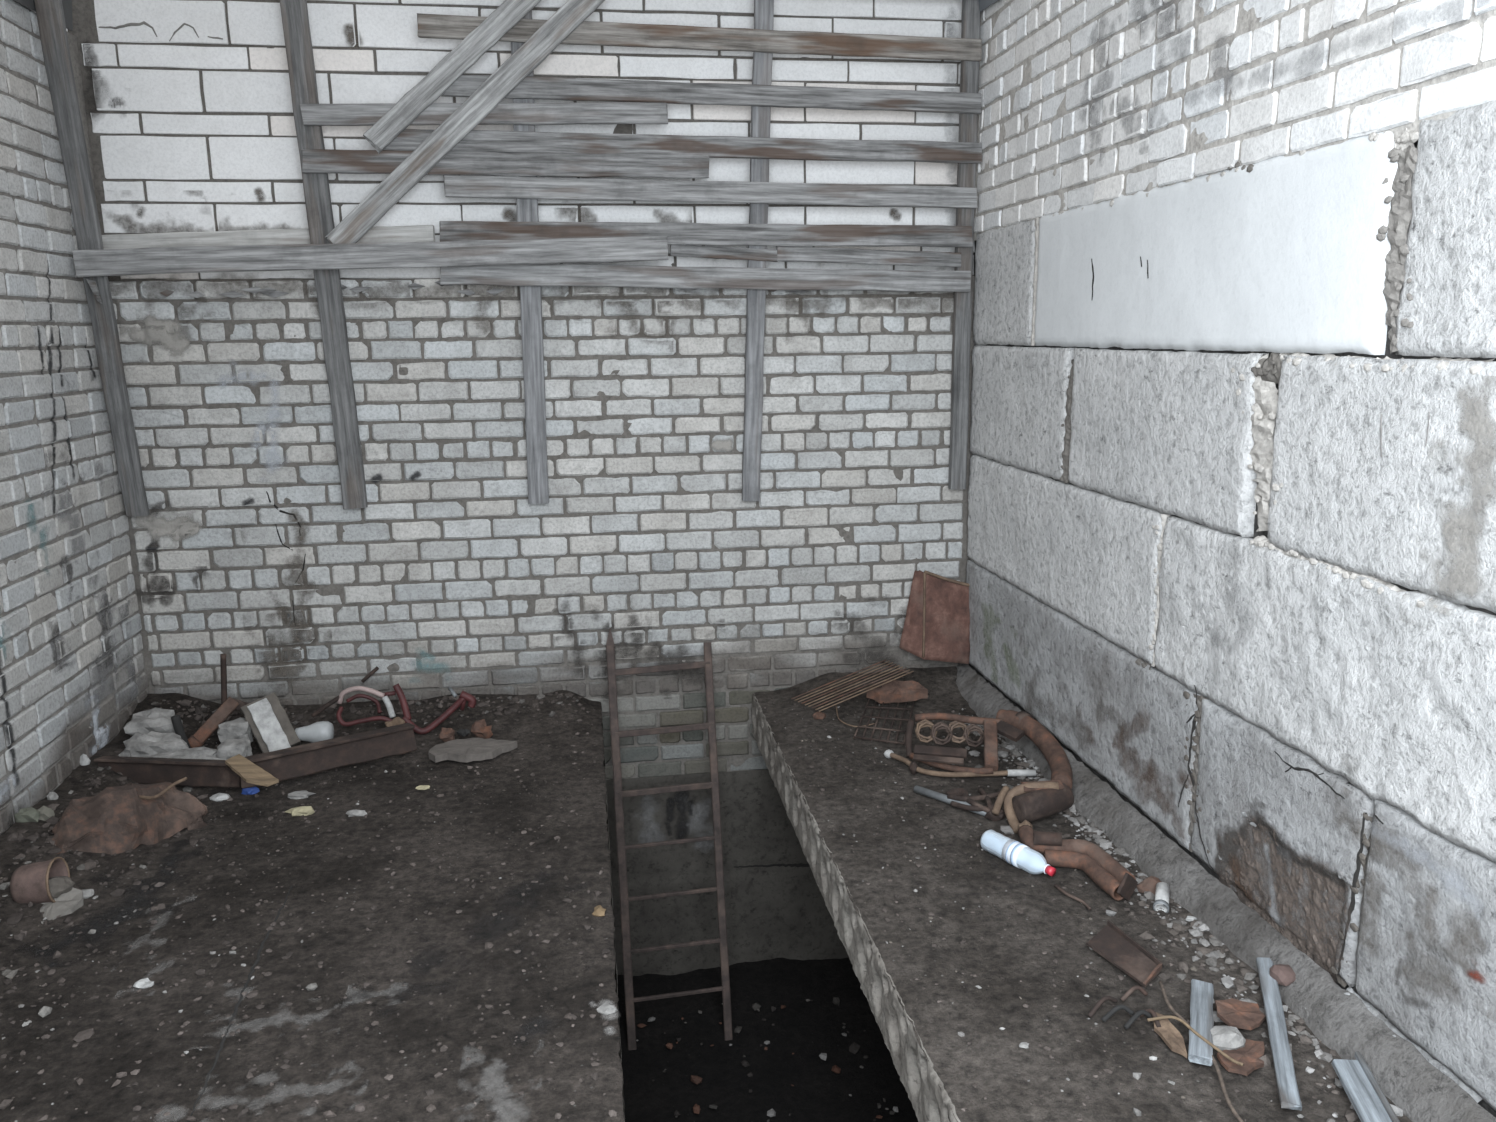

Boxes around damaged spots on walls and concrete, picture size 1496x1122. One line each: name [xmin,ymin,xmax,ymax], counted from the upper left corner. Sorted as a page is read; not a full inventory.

damp [263,513,332,681]
spalling [1183,691,1206,823]
crack [1178,685,1214,870]
crack [1274,751,1384,978]
spalling [1207,812,1482,1103]